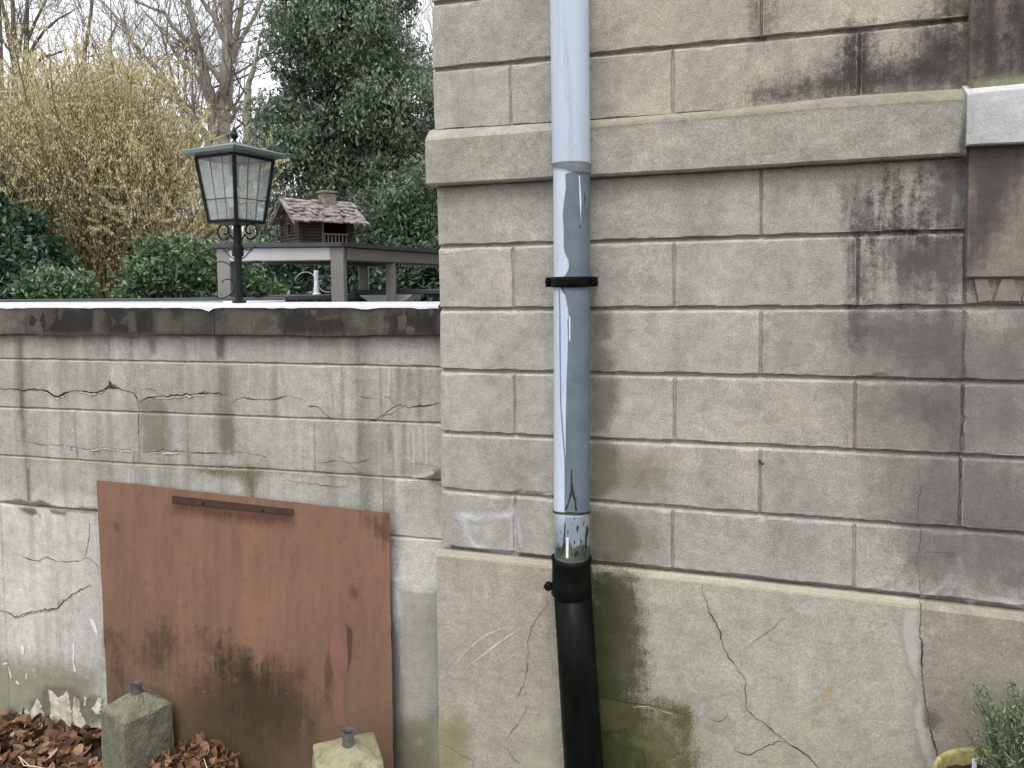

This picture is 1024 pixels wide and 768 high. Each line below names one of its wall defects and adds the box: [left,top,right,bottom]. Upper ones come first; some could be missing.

leakage [871,158,967,303]
leakage [105,308,153,335]
leakage [280,308,345,336]
leakage [390,311,438,336]
crack [0,386,333,462]
crack [363,397,438,422]
crack [0,524,99,619]
crack [916,469,956,756]
crack [599,585,819,768]
leakage [599,698,687,768]